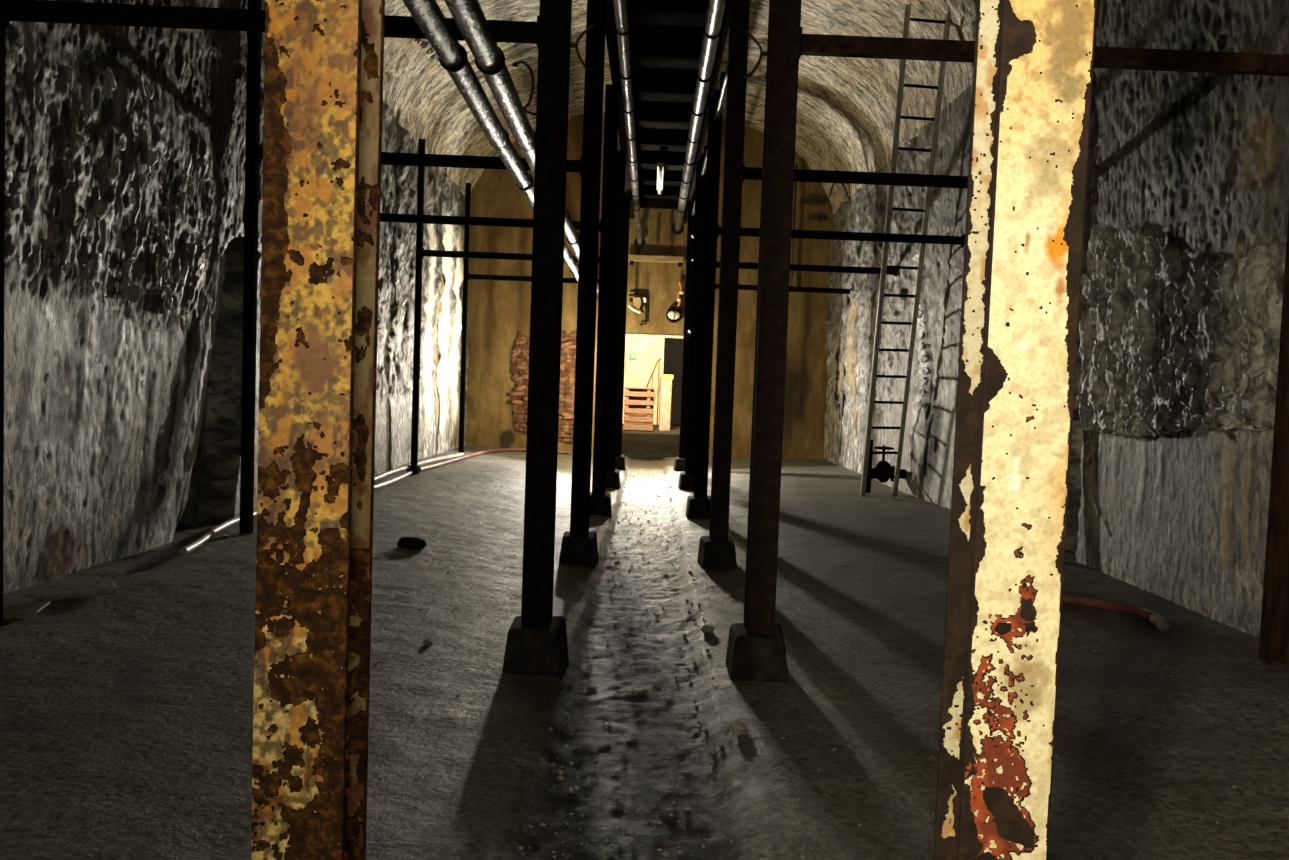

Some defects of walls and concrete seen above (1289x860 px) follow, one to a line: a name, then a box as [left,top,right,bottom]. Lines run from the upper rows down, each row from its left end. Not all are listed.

flaking render [510,331,530,435]
flaking render [558,330,576,444]
peeling [941,0,1286,860]